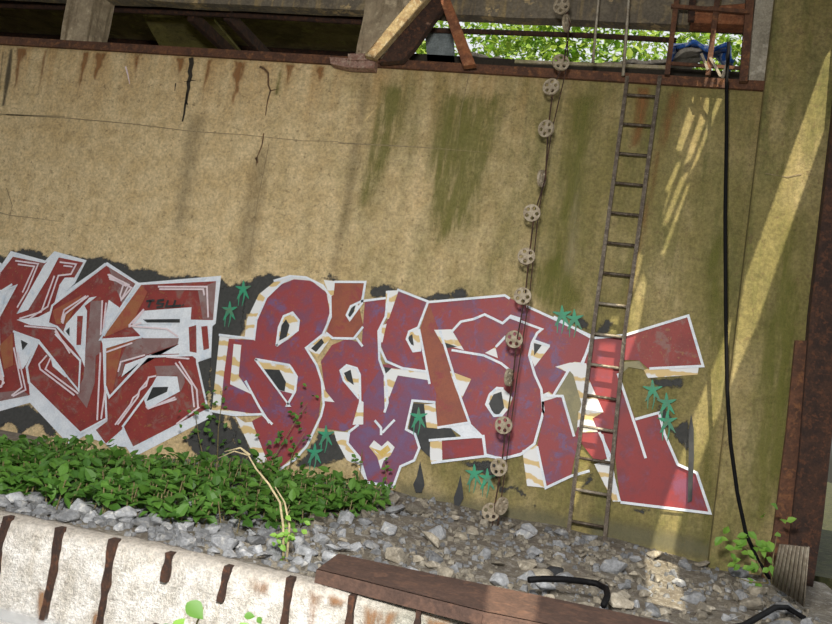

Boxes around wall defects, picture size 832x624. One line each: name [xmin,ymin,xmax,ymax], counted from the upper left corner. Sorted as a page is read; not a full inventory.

rust [80,53,105,82]
rust [233,62,244,100]
crack [0,57,305,267]